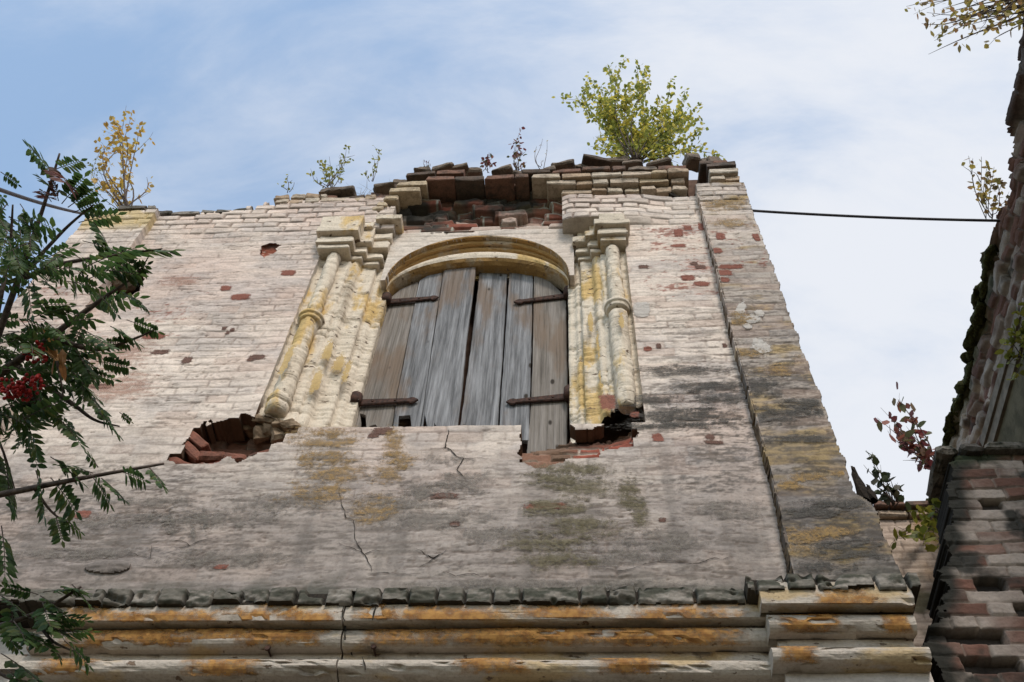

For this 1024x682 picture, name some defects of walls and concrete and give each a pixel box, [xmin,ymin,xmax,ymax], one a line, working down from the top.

spalling [396,190,563,234]
leakage [701,197,751,228]
spalling [169,414,301,464]
crack [432,430,481,483]
spalling [521,432,638,468]
leakage [72,426,709,591]
crack [339,487,481,577]